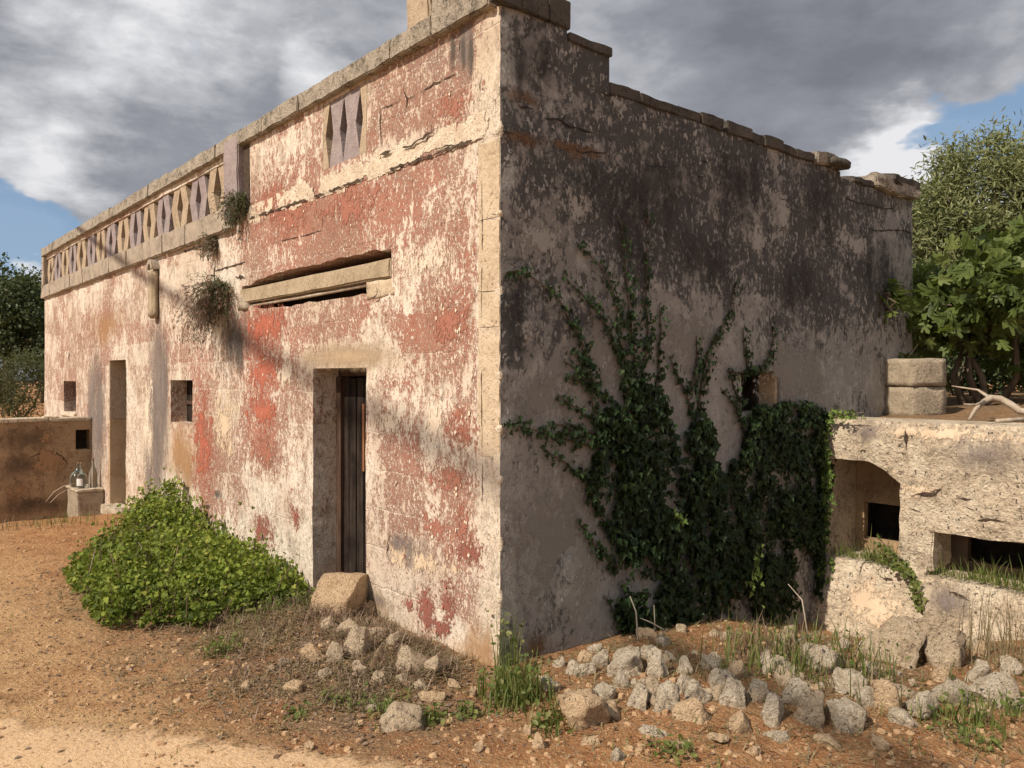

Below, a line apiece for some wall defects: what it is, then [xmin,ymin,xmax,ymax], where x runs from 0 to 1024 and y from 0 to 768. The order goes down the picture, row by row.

spalling [247,79,504,246]
crack [249,44,525,241]
peeling [394,247,452,279]
peeling [424,285,471,351]
peeling [137,363,156,492]
peeling [189,301,298,505]
peeling [424,397,479,452]
peeling [248,507,275,550]
peeling [380,464,503,639]